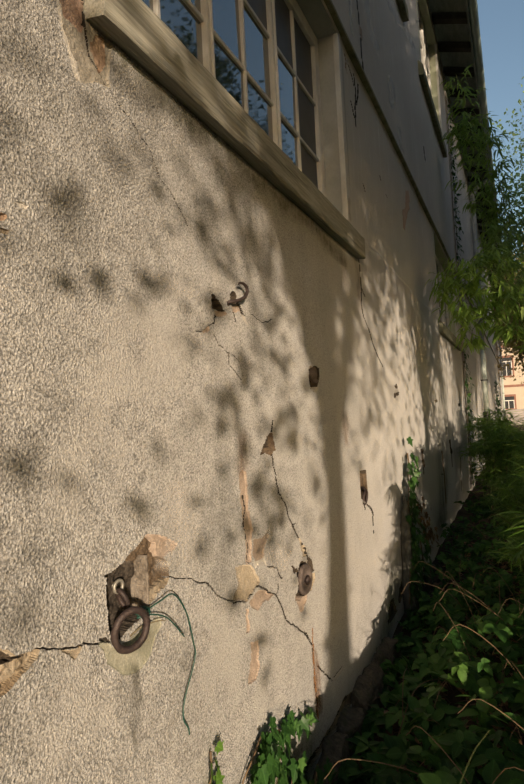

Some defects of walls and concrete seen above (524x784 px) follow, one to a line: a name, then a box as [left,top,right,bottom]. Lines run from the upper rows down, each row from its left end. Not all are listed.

flaking render [56,0,113,87]
crack [81,0,188,226]
crack [344,0,364,126]
crack [213,334,242,380]
crack [358,259,383,367]
crack [271,454,308,558]
spalling [125,534,178,604]
peeling [233,470,274,684]
flaking render [0,648,40,697]
crack [35,637,110,660]
crack [160,566,343,719]
flaking render [304,692,352,774]